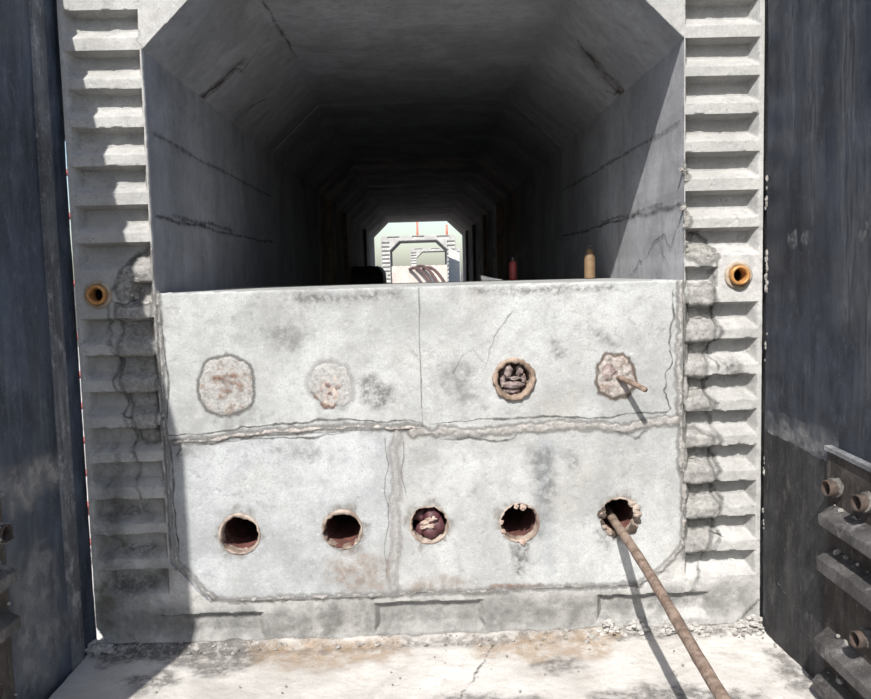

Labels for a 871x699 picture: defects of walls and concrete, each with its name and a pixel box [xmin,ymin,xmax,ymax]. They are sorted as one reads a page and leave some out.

crack [564,203,679,270]
spalling [678,204,715,264]
spalling [116,255,154,304]
spalling [311,375,341,409]
crack [205,292,675,445]
crack [161,320,184,549]